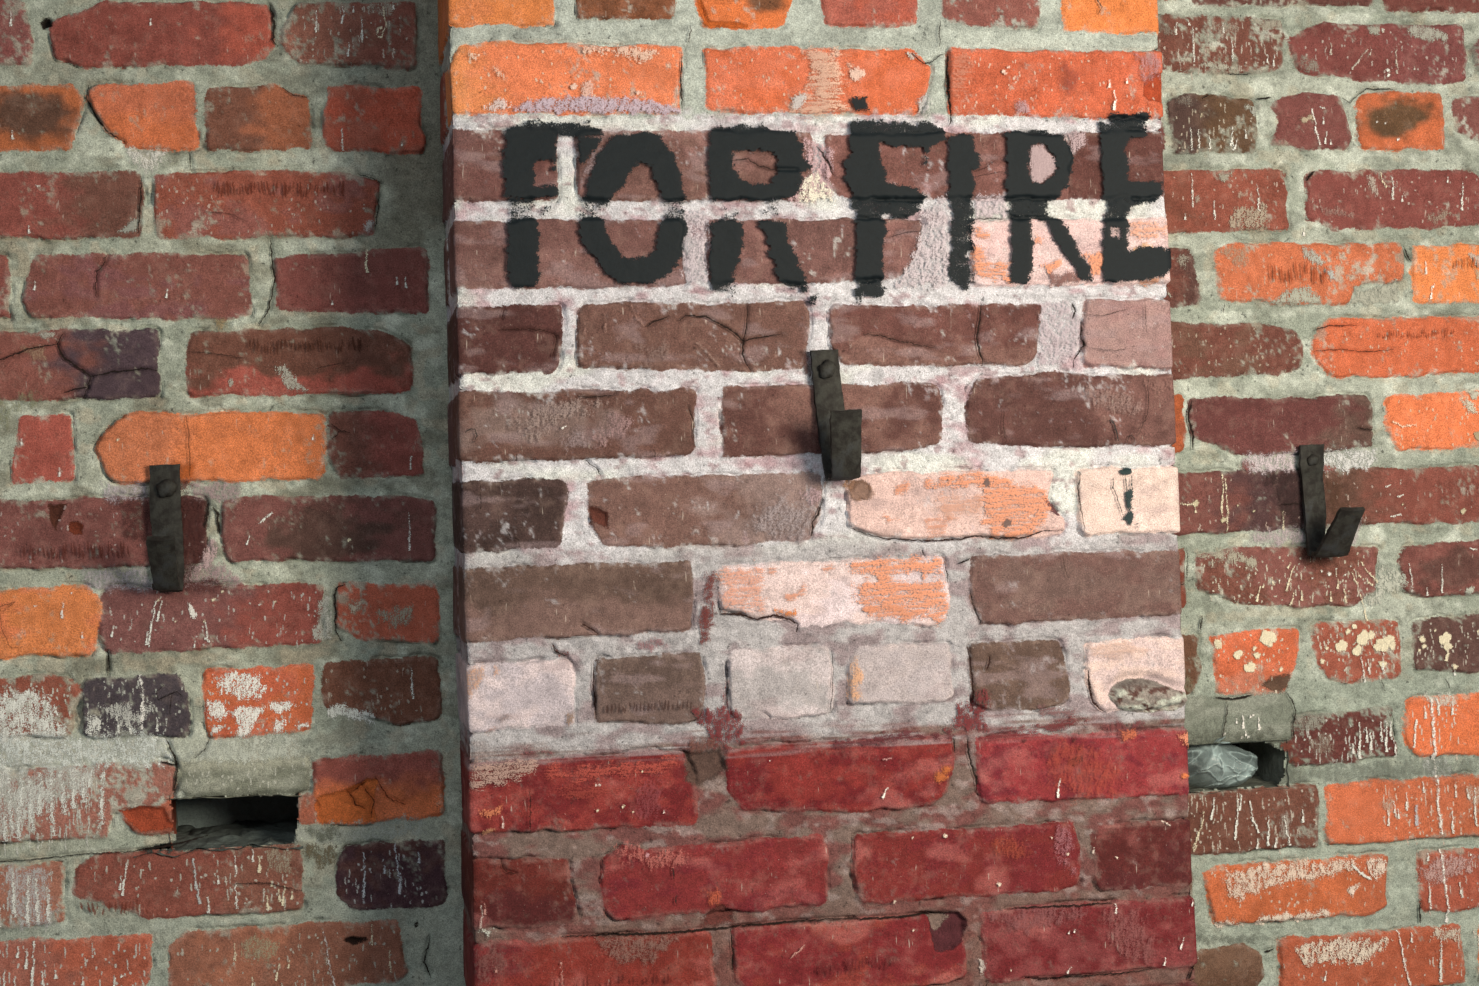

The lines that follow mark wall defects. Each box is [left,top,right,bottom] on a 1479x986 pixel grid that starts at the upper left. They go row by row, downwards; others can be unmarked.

crack [0,334,158,397]
crack [647,307,780,369]
spalling [120,778,378,858]
crack [347,778,404,814]
hole [1187,740,1290,794]